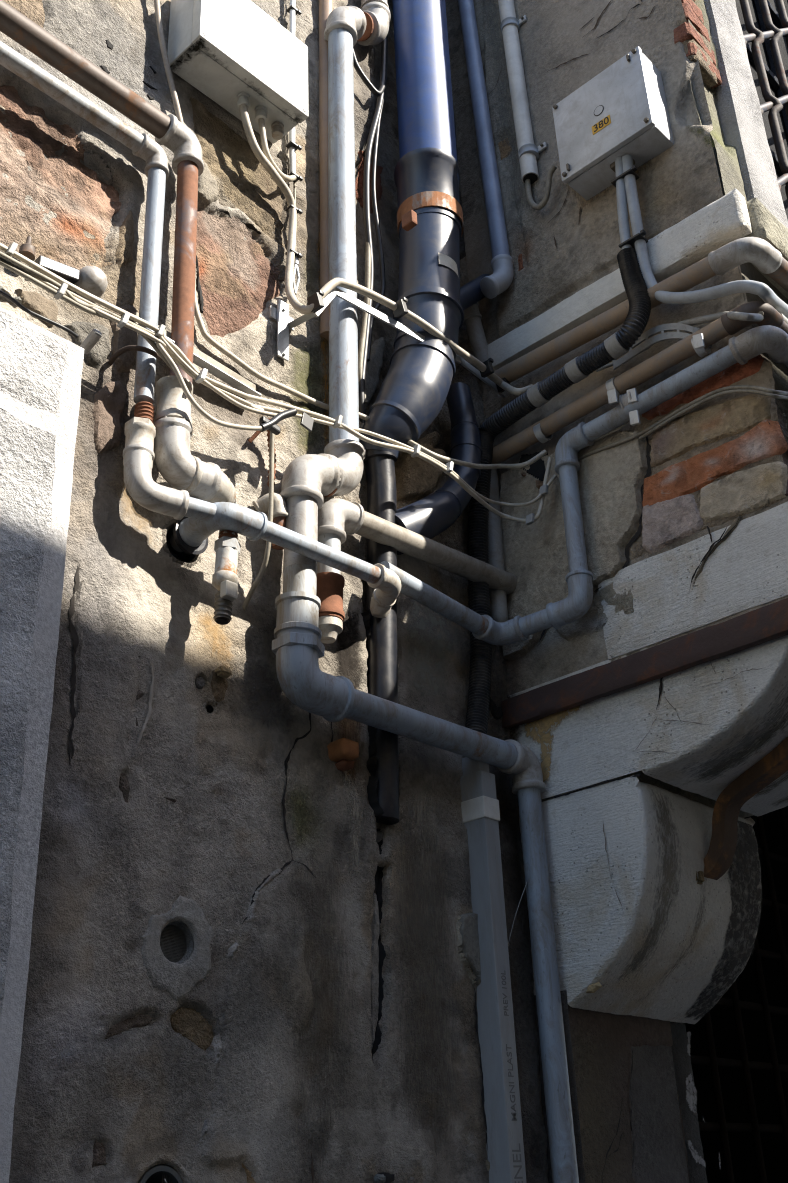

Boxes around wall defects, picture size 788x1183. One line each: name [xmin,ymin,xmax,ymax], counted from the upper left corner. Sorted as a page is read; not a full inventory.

crack [689,515,741,592]
crack [68,564,84,765]
crack [242,712,333,924]
spalling [104,1014,152,1039]
spalling [170,1007,222,1071]
crack [371,829,386,1061]